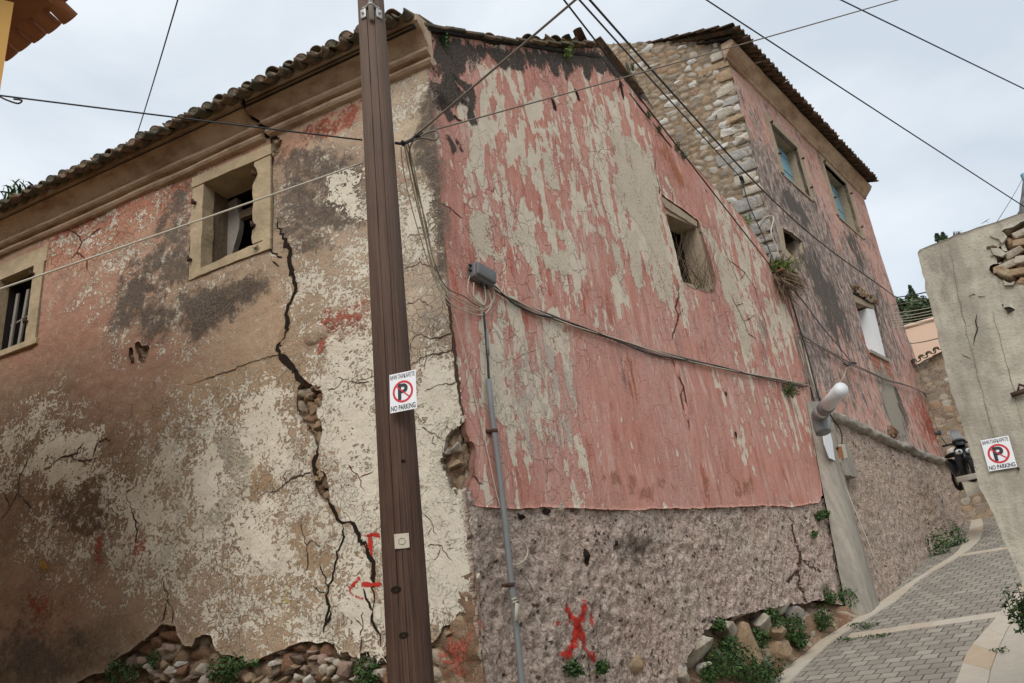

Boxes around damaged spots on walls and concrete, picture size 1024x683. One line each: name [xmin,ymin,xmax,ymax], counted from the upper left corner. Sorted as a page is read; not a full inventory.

water stain [108,181,270,351]
water stain [271,132,365,253]
crack [188,1,462,680]
peeling [399,192,437,242]
water stain [404,34,654,278]
crack [672,292,690,431]
water stain [780,182,853,356]
spalling [986,224,1024,286]
crack [2,438,110,518]
peeling [16,301,387,683]
peeling [412,348,484,680]
crack [787,517,821,602]